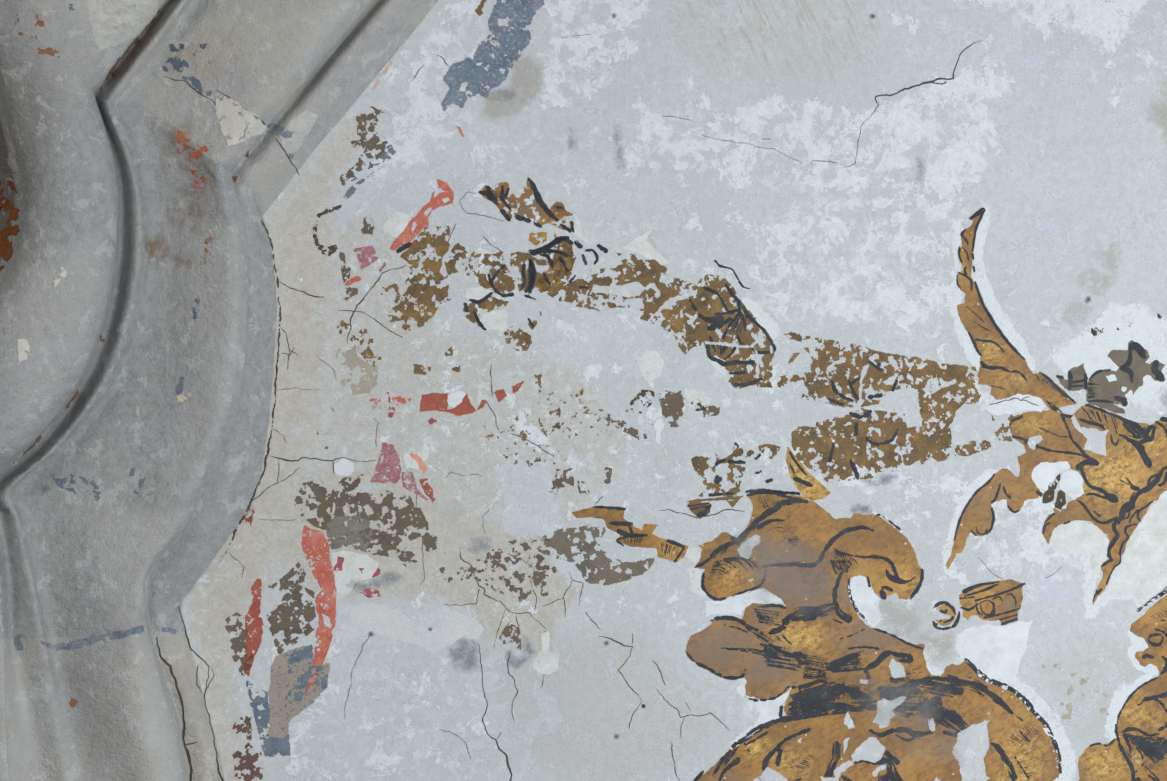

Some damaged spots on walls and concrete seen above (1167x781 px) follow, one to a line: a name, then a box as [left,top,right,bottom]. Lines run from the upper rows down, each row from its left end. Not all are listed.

crack [665,40,983,167]
peeling [313,205,358,301]
crack [280,265,406,342]
crack [252,419,379,521]
crack [487,365,555,458]
peeling [484,374,720,495]
crack [156,606,224,781]
peeling [225,612,258,693]
peeling [267,562,316,654]
peeling [295,472,654,602]
crack [438,552,730,781]
spalling [685,546,706,597]